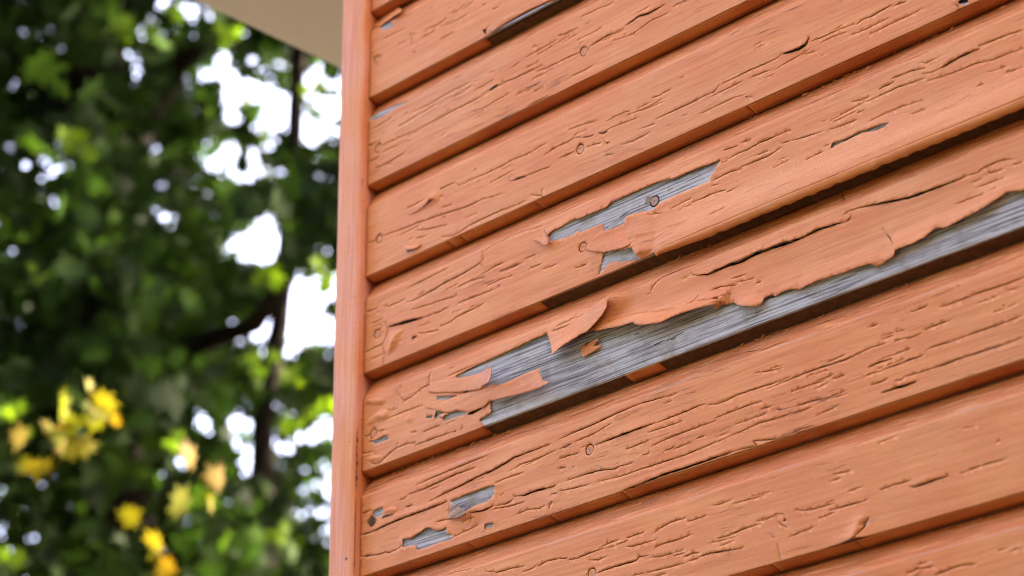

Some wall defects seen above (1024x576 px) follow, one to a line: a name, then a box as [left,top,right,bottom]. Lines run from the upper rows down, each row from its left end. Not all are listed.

peeling [482,0,562,40]
crack [366,255,585,350]
crack [369,1,908,243]
peeling [426,191,1024,425]
peeling [533,97,1024,269]
crack [656,159,1022,289]
crack [683,32,1017,203]
crack [363,279,1021,557]
peeling [403,485,495,550]
crack [487,461,1000,576]